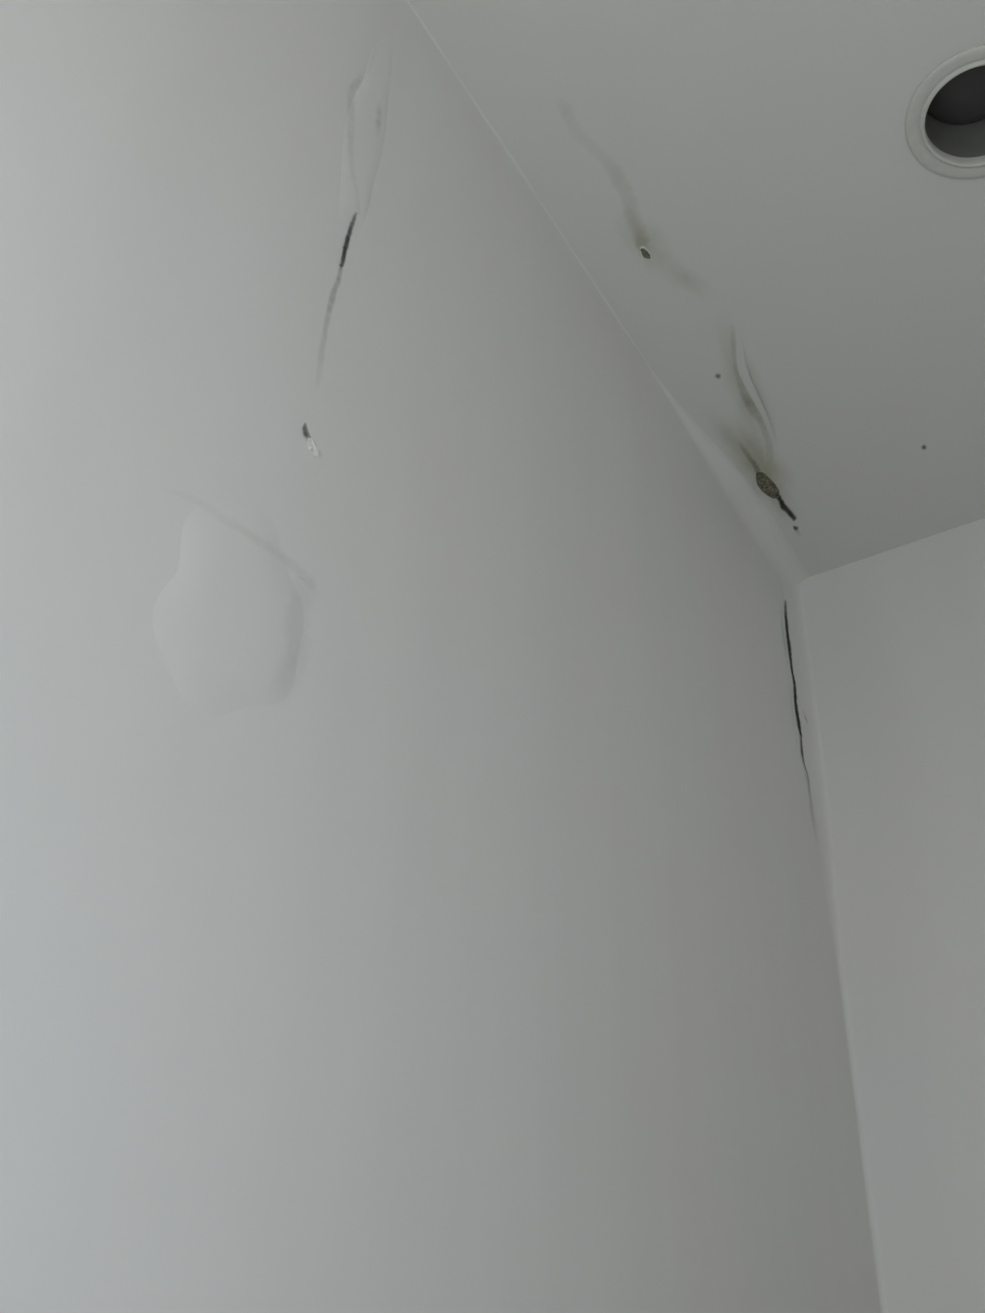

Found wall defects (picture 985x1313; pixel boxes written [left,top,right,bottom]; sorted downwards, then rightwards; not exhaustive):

crack [341,222,354,265]
crack [756,472,797,530]
crack [781,599,807,771]